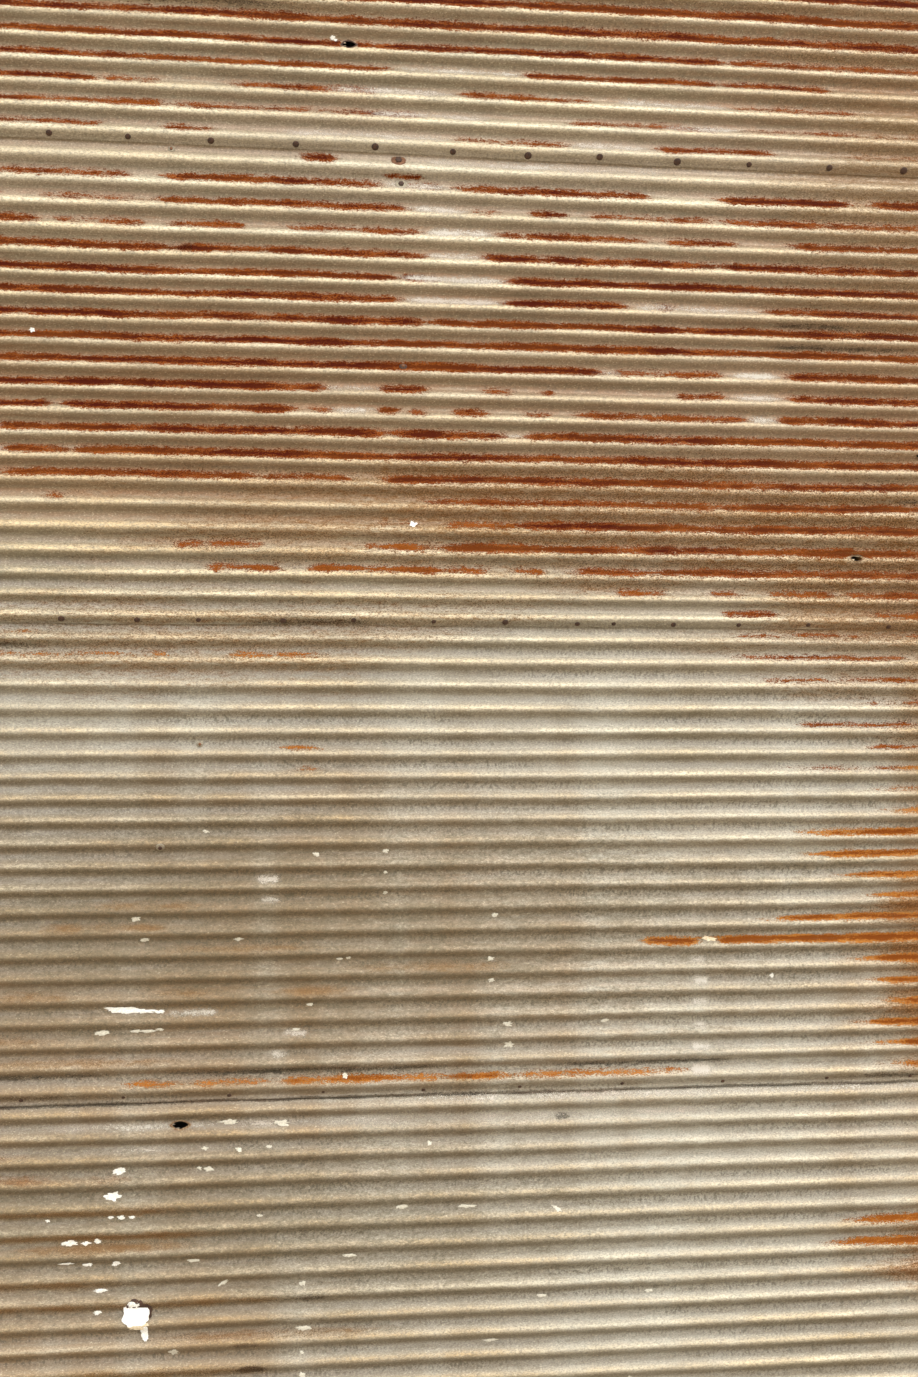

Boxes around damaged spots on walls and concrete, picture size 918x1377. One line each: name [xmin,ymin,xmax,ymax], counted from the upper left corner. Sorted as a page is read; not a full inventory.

corrosion [0,0,918,162]
corrosion [0,152,918,1069]
corrosion [121,1066,688,1090]
corrosion [824,1212,918,1280]